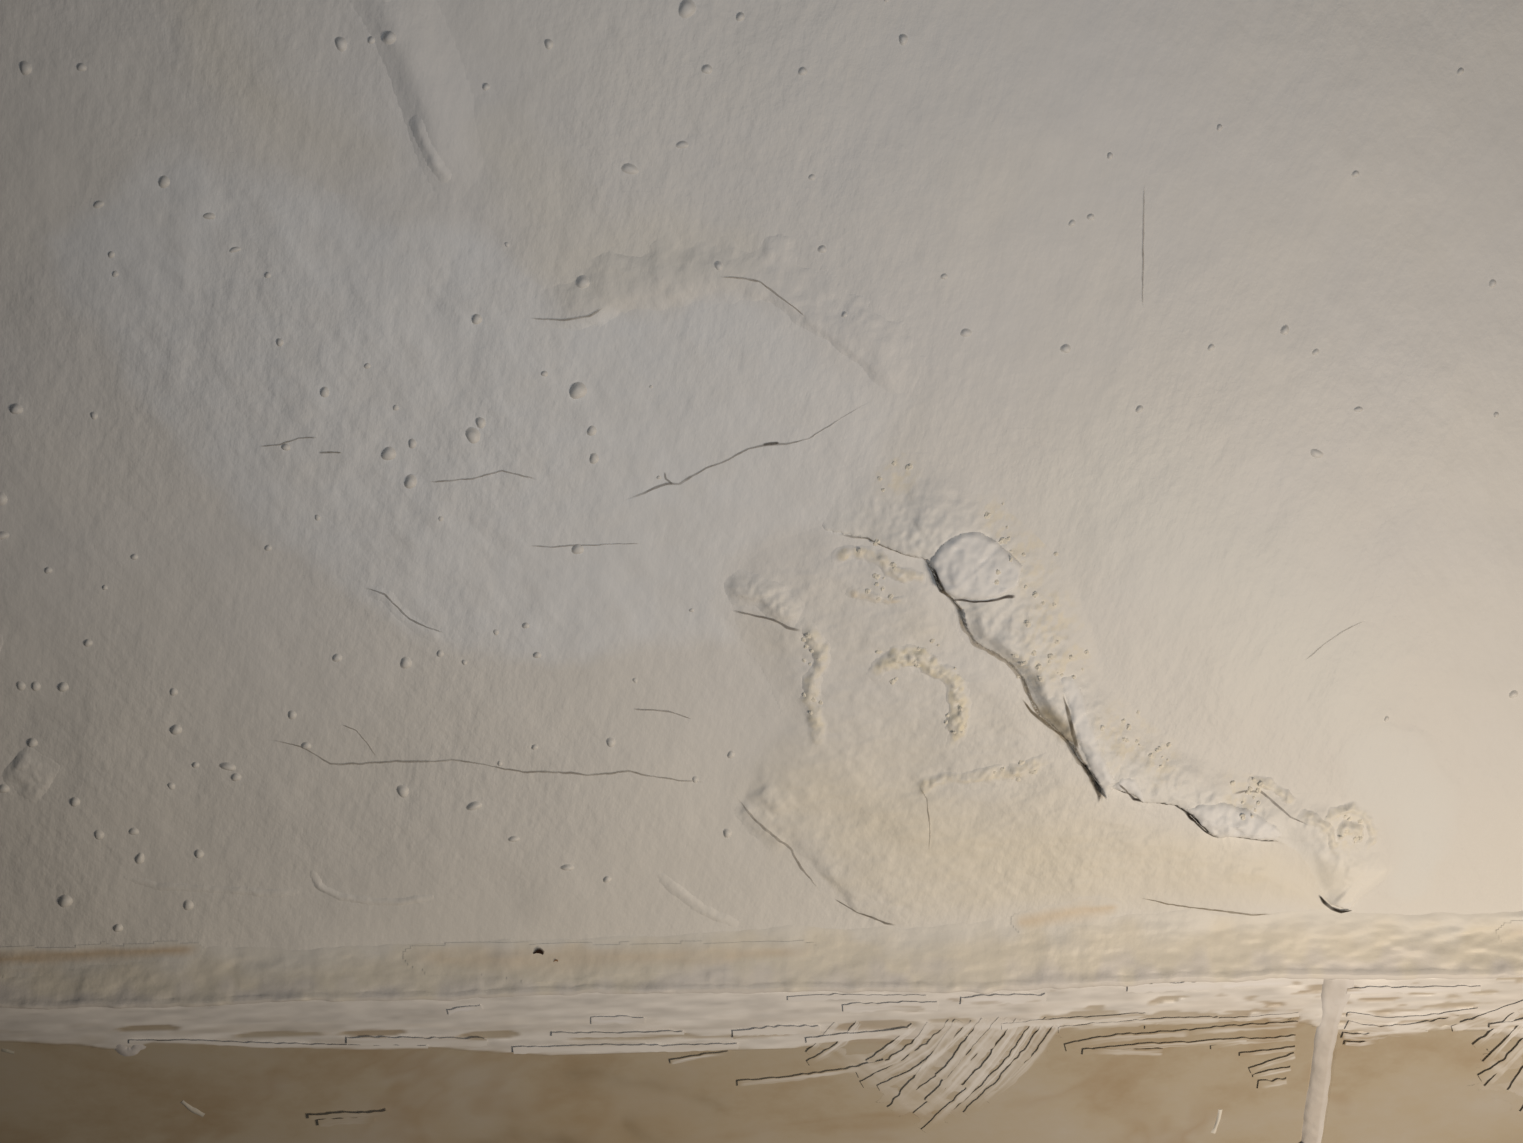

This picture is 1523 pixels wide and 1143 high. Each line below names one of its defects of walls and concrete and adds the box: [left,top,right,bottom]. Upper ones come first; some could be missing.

crack [728,277,801,313]
crack [647,422,835,492]
crack [857,537,1301,841]
crack [287,726,412,765]
crack [462,761,679,781]
crack [1151,900,1264,915]
crack [1320,897,1351,913]